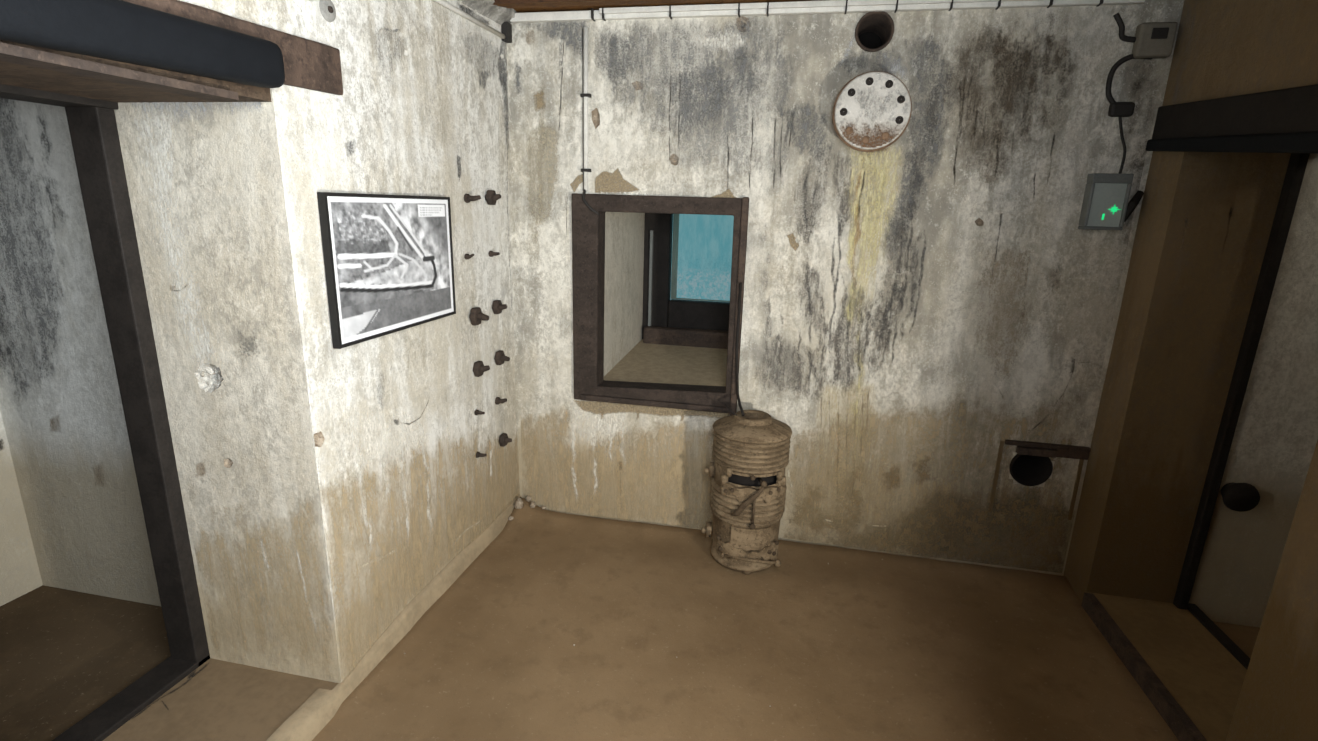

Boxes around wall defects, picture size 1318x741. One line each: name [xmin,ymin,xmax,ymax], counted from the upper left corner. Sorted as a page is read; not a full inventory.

damp [499,41,521,213]
damp [529,21,585,56]
damp [598,21,1072,573]
rust [841,124,901,321]
damp [196,400,729,672]